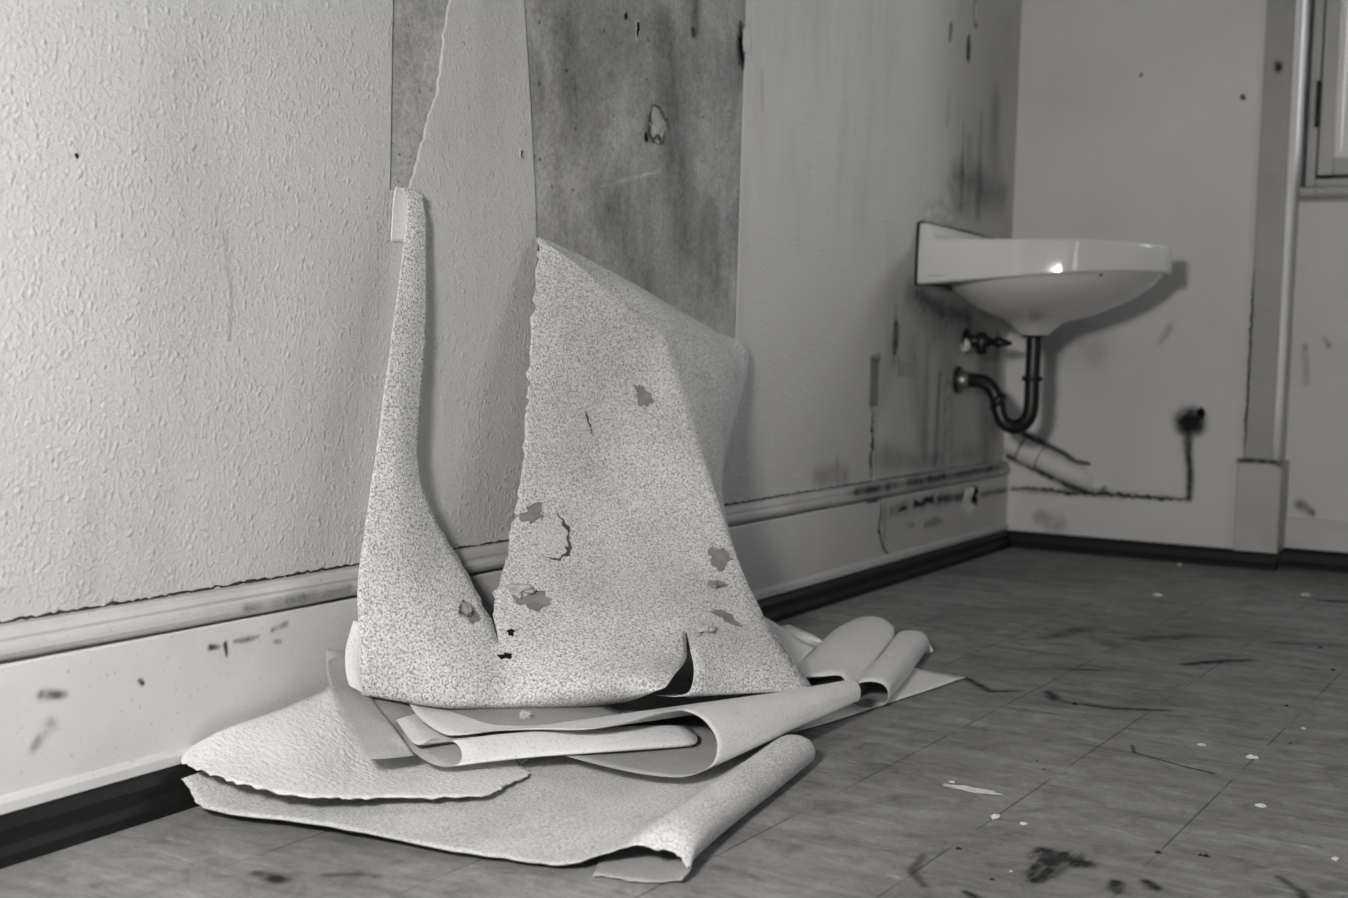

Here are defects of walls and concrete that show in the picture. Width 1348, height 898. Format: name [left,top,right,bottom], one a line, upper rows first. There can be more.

peeling [387,0,751,549]
water stain [854,385,999,495]